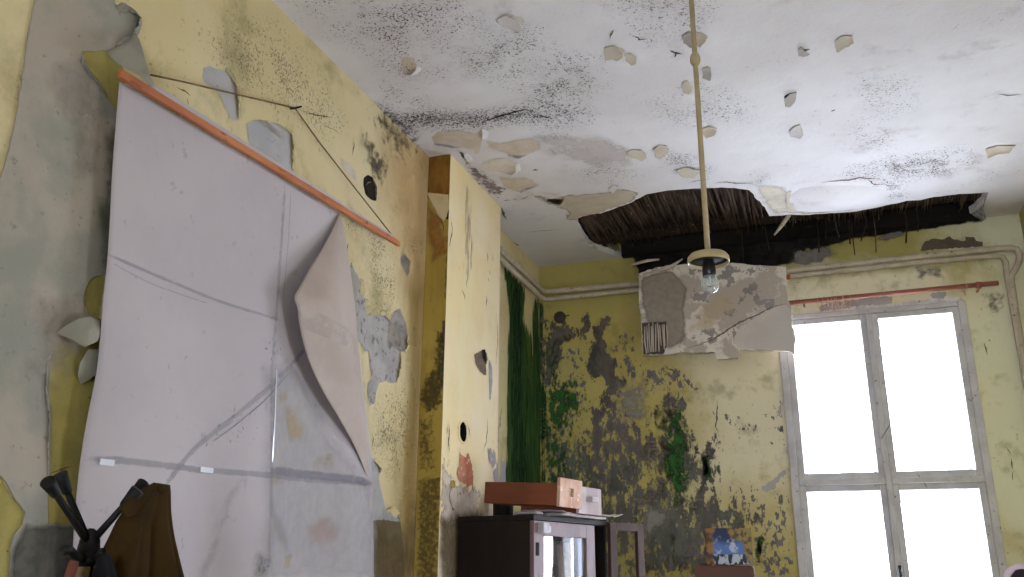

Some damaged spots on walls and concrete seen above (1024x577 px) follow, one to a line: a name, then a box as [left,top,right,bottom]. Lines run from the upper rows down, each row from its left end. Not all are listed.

peeling [784,92,797,107]
peeling [432,129,563,207]
leakage [538,154,637,220]
crack [822,177,880,185]
leakage [840,146,982,201]
flaking render [920,236,983,251]
peeling [0,0,142,577]
peeling [354,270,409,405]
crack [689,304,784,348]
leakage [403,321,455,577]
peeling [540,314,793,577]
flaking render [441,454,480,524]